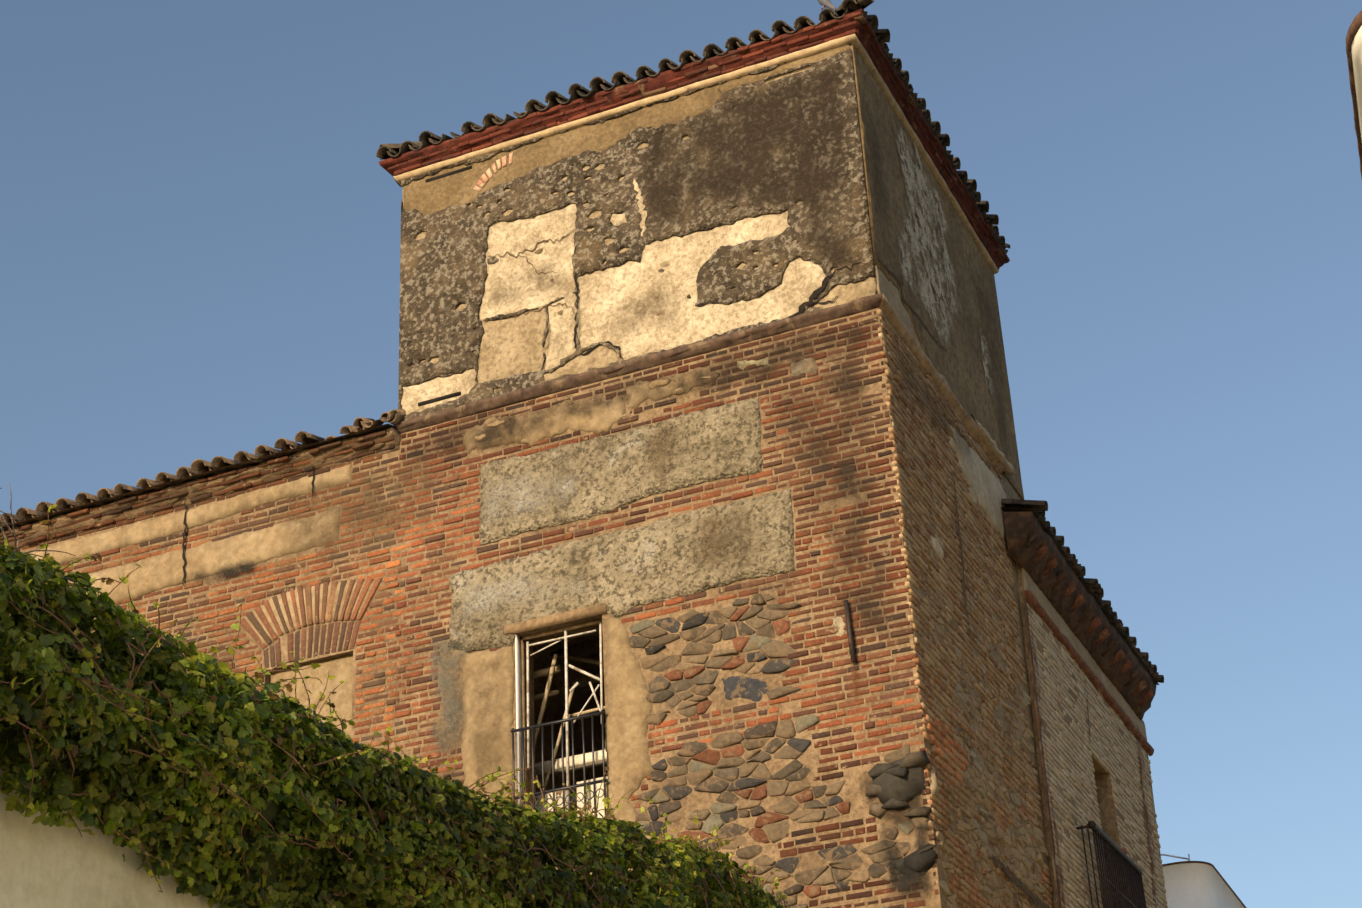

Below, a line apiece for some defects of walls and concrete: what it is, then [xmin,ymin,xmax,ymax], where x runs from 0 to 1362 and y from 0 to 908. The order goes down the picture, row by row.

crack [485,232,623,359]
spalling [401,129,958,417]
crack [180,502,188,586]